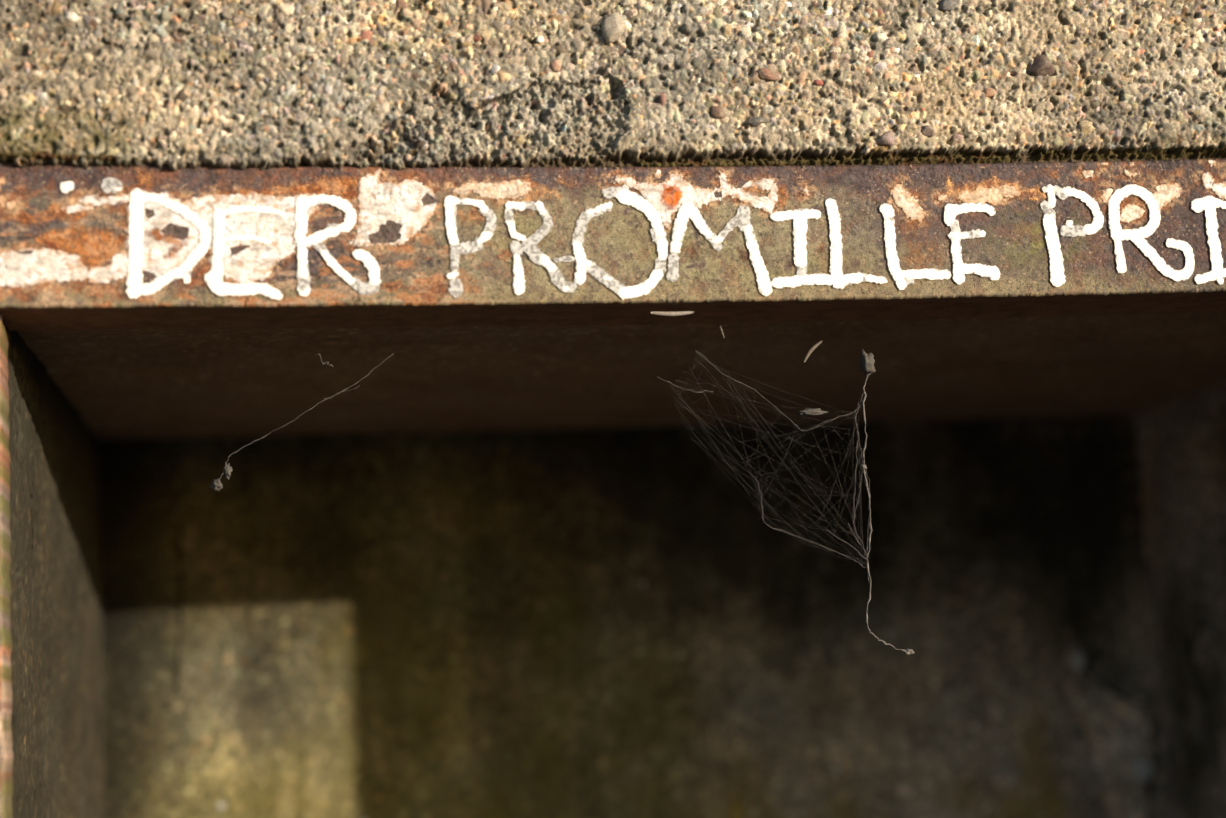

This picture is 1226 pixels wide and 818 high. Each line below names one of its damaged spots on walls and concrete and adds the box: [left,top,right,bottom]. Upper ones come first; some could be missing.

rust [212,176,359,202]
rust [661,185,682,210]
rust [743,181,788,207]
rust [947,176,1046,200]
rust [35,181,125,300]
rust [144,228,187,258]
rust [174,263,212,297]